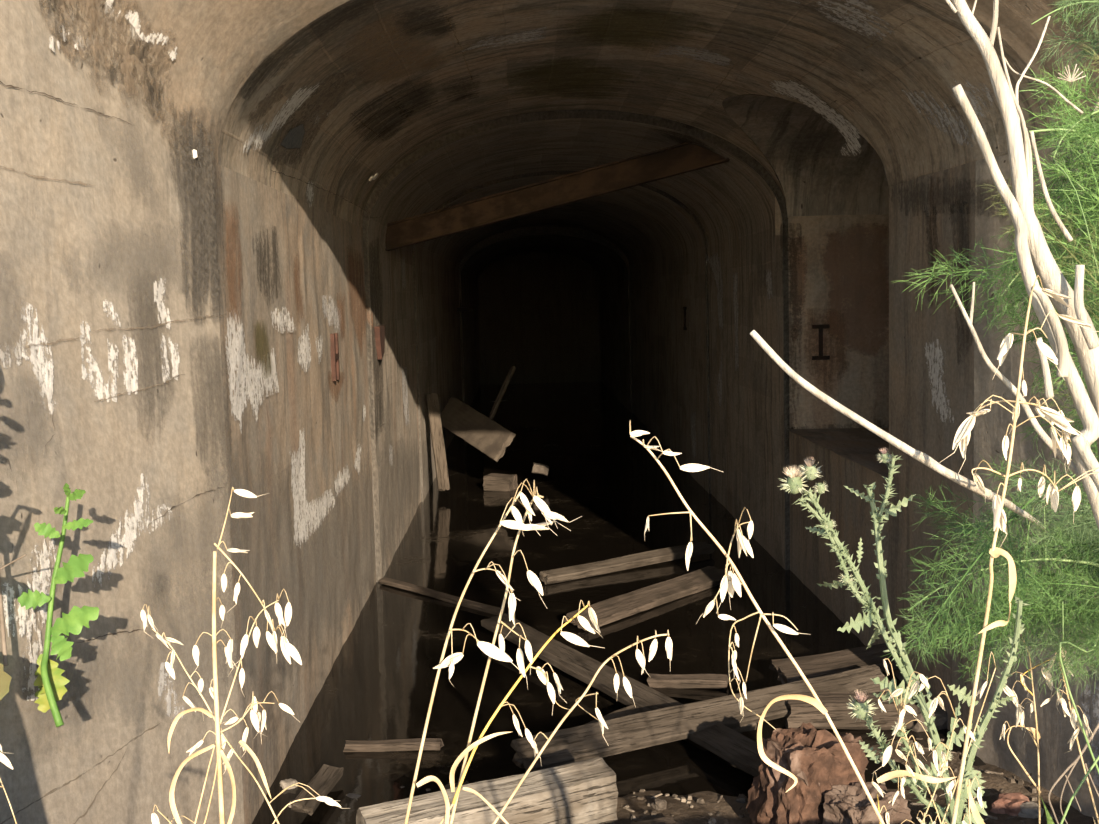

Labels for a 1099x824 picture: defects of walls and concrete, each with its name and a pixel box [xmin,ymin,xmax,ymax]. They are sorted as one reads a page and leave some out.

crack [0,81,135,126]
spalling [41,0,207,168]
leakage [170,107,279,459]
leakage [271,295,341,373]
crack [77,628,146,643]